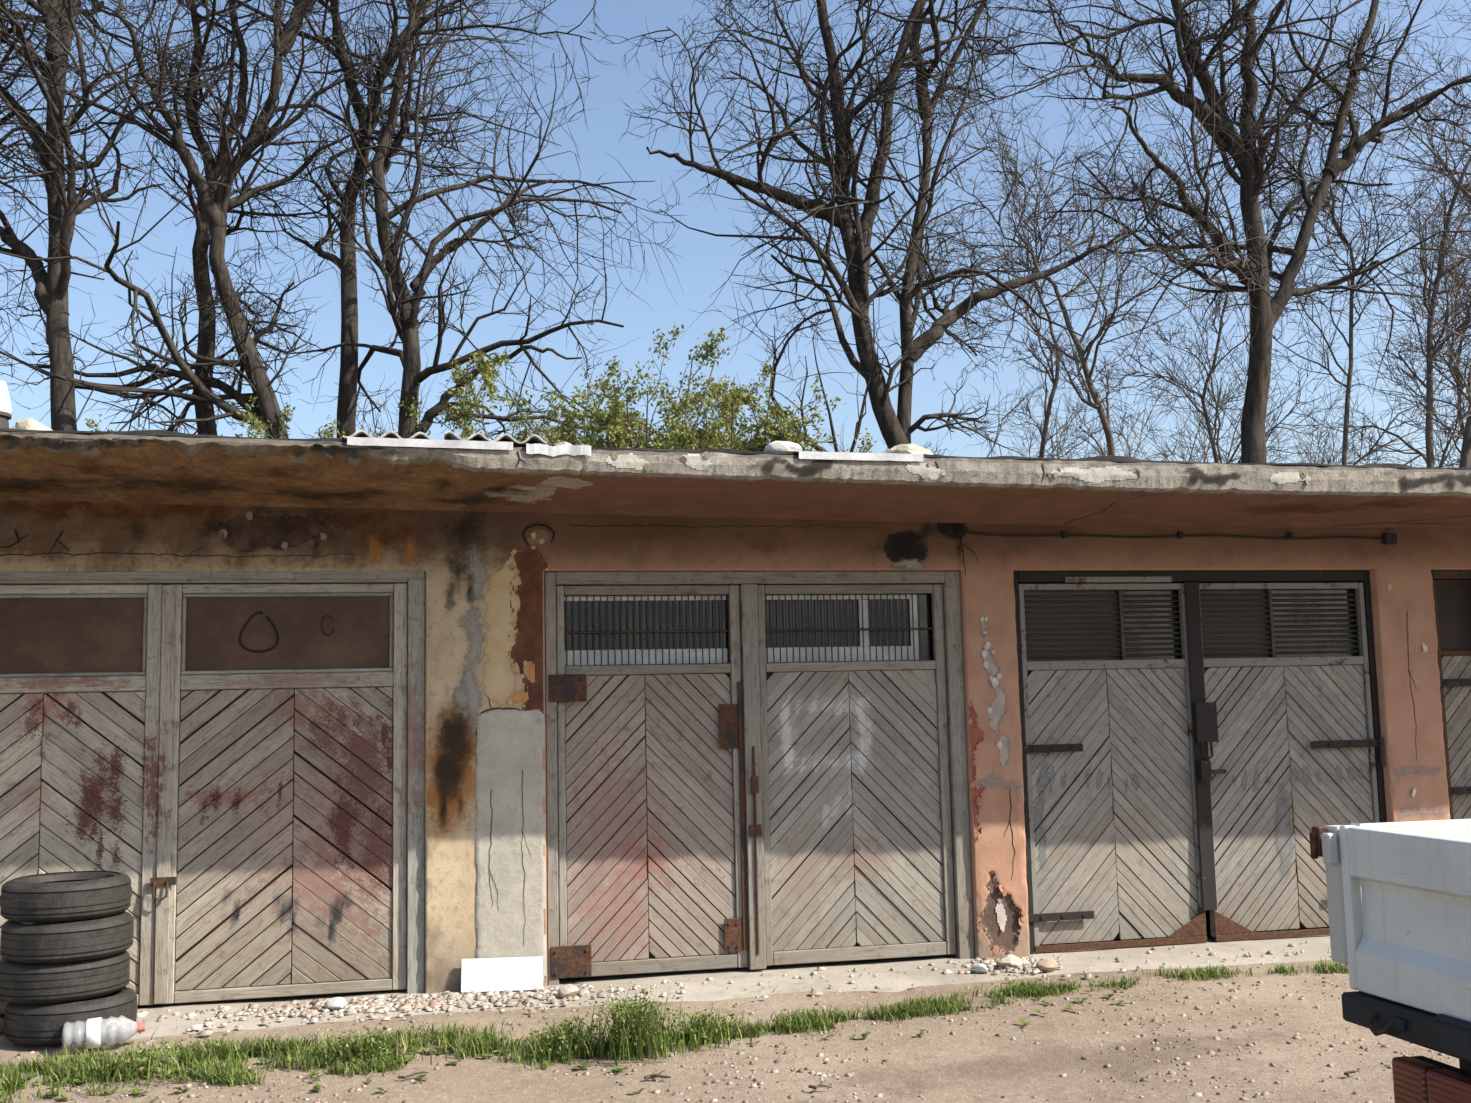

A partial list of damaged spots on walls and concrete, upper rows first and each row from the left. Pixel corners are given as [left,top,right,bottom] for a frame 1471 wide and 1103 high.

damp [0,432,400,550]
peeling [967,617,1010,839]
flaking render [977,871,1027,955]